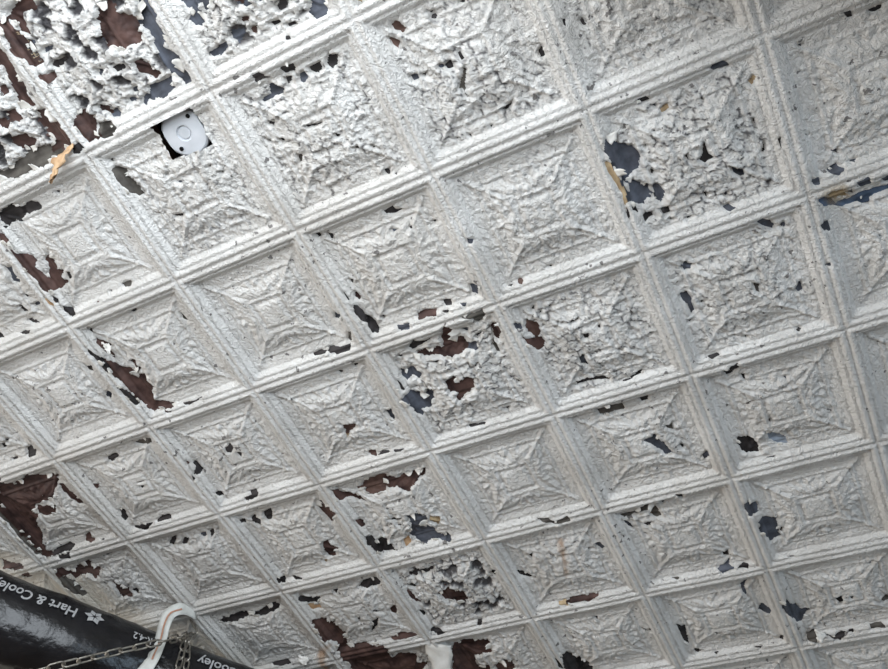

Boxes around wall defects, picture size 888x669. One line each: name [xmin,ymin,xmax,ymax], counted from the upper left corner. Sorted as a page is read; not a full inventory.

peeling [94,0,192,105]
peeling [210,0,262,56]
peeling [604,131,671,224]
peeling [819,175,888,206]
peeling [0,200,75,334]
peeling [87,327,202,413]
peeling [386,299,501,421]
peeling [514,305,550,350]
peeling [0,472,141,599]
peeling [316,468,426,521]
peeling [355,513,452,555]
peeling [298,595,517,669]